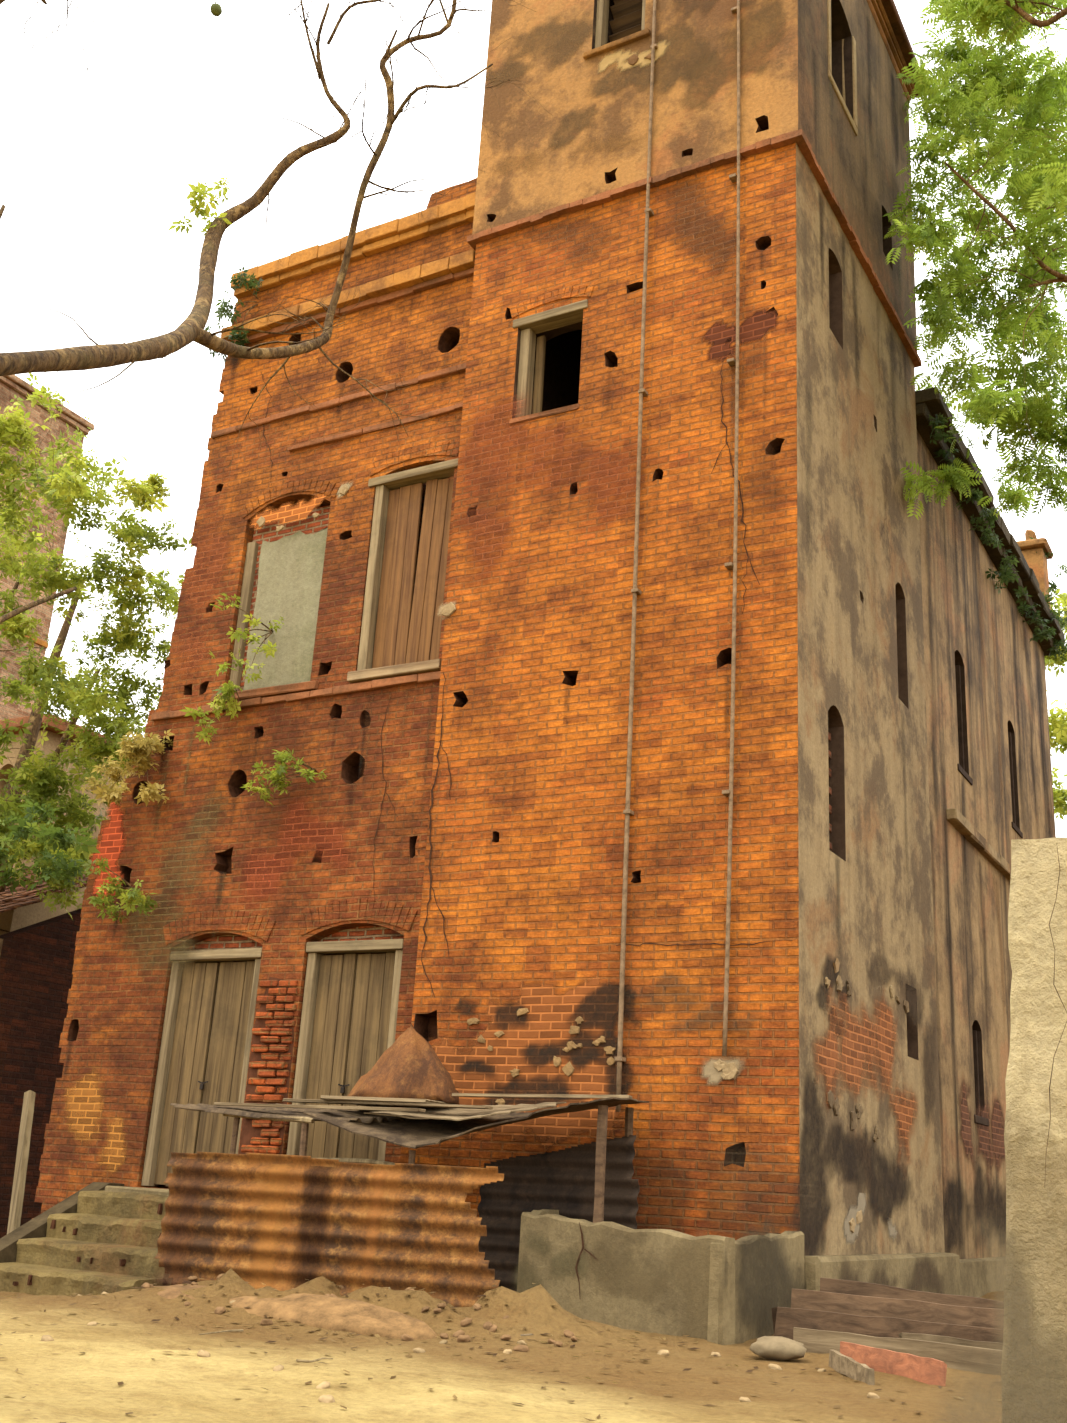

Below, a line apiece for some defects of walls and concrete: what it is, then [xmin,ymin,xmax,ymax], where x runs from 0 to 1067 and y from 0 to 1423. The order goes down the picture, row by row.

peeling [251,483,351,532]
damp [1011,606,1046,797]
crack [373,673,452,997]
damp [933,728,965,863]
spalling [433,977,627,1152]
peeling [703,1059,740,1083]
spalling [816,958,916,1159]
corrosion [252,1164,288,1289]
corrosion [296,1166,331,1286]
crack [575,1222,598,1296]